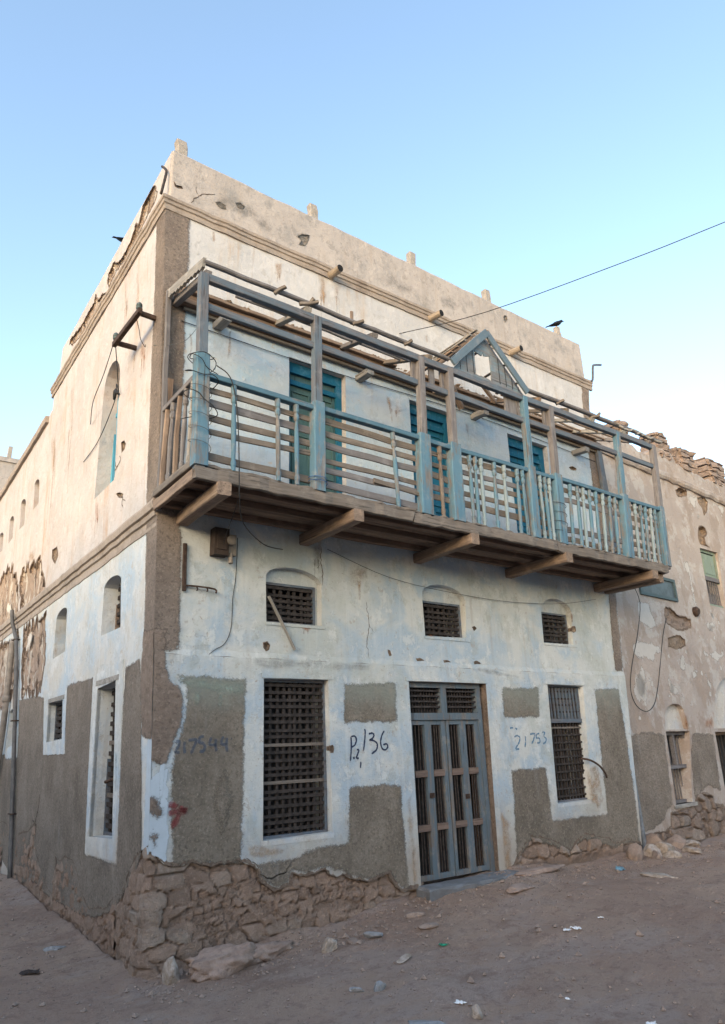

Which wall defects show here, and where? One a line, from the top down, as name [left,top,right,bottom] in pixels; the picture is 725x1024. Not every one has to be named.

flaking render [69,185,158,346]
flaking render [0,546,58,710]
spalling [633,559,724,720]
spalling [0,736,423,980]